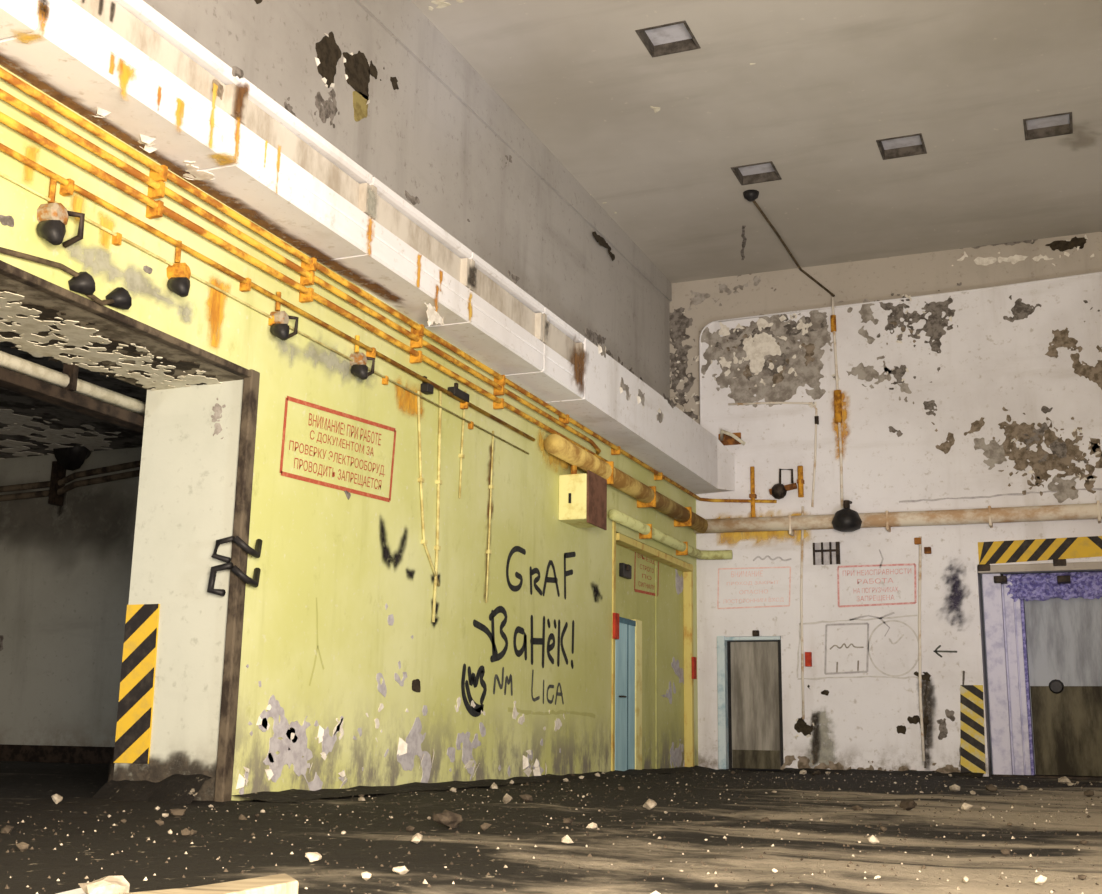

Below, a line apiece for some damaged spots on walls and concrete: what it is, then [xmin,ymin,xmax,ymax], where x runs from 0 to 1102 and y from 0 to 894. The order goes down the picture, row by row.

rust [109,54,134,96]
rust [176,98,184,128]
rust [209,83,249,165]
peeling [314,32,399,128]
peeling [951,235,1094,266]
peeling [0,289,222,391]
rust [207,279,230,347]
peeling [0,409,121,459]
rust [833,393,848,457]
peeling [656,274,1102,503]
peeling [248,695,362,791]
peeling [365,661,434,783]